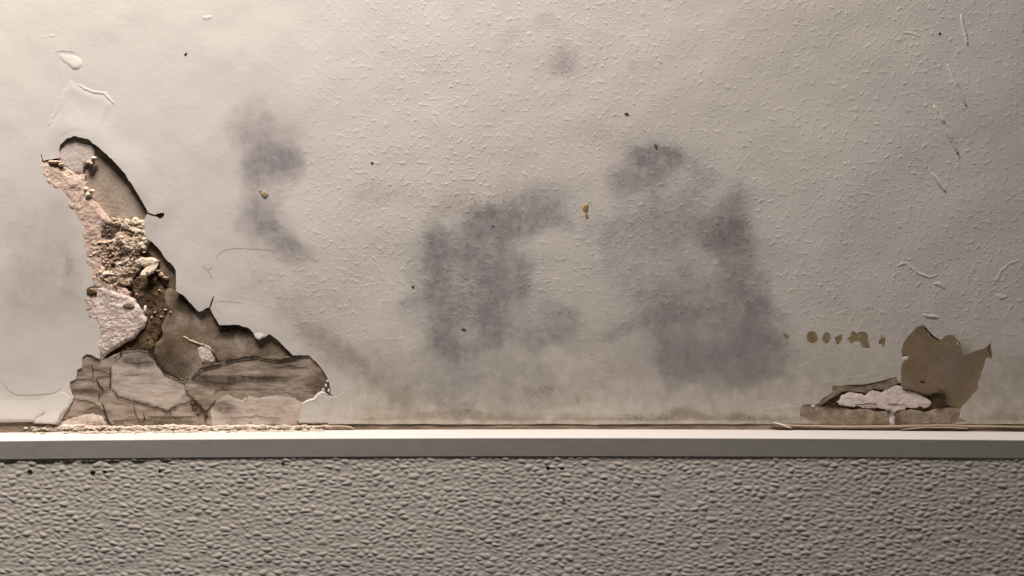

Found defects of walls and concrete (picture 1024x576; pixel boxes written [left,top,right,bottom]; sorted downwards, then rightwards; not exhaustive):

spalling [31,136,346,432]
peeling [800,325,992,426]